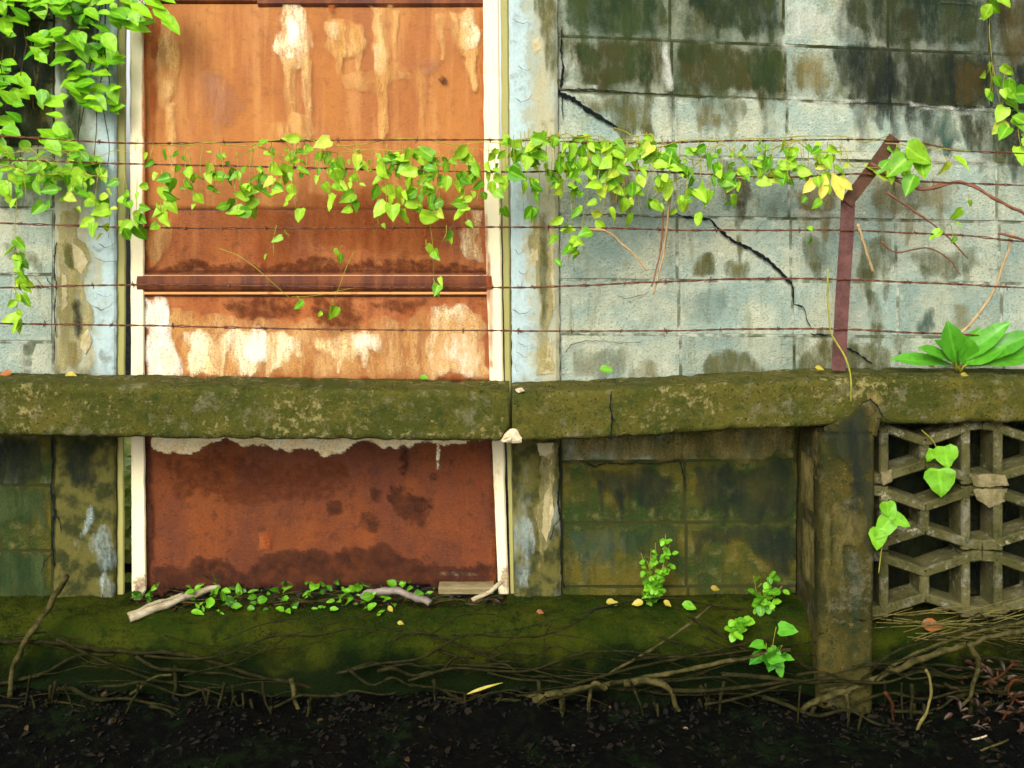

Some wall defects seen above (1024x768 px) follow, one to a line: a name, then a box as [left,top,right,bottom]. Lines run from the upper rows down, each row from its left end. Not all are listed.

rust [142,17,163,137]
crack [558,27,668,129]
leakage [566,0,988,159]
leakage [998,1,1024,86]
peeling [55,208,94,370]
rust [224,296,359,333]
rust [146,191,491,299]
crack [580,209,872,364]
leakage [0,551,47,596]
peeling [151,437,467,466]
rust [133,444,509,601]
spalling [971,474,1009,508]